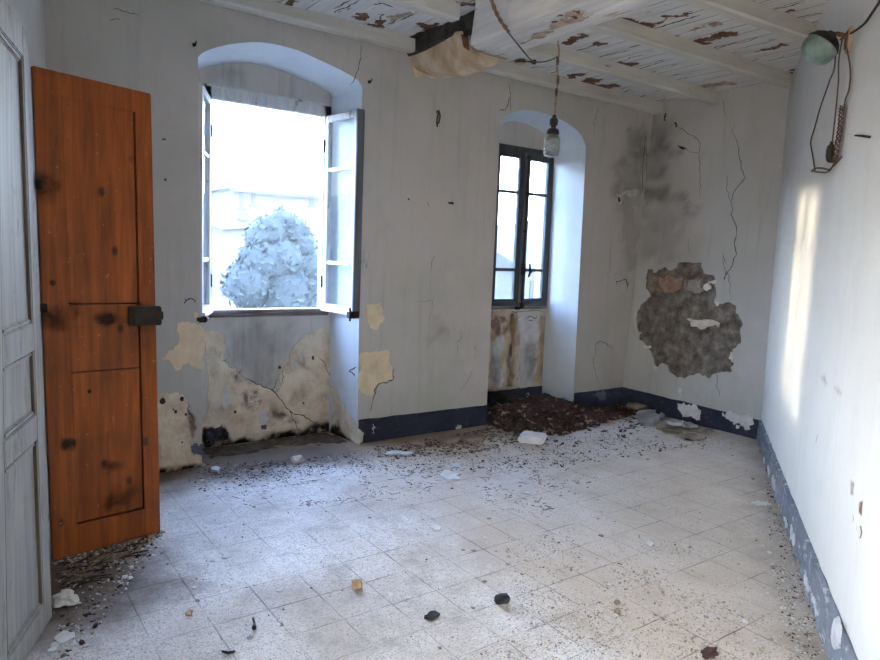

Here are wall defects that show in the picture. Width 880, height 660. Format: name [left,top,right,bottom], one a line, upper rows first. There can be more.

peeling [334,0,441,33]
peeling [520,9,687,80]
peeling [622,11,761,49]
peeling [753,39,801,61]
peeling [562,73,645,97]
crack [723,101,746,299]
spalling [634,262,743,378]
flaking render [157,311,376,474]
crack [245,377,314,428]
flaking render [357,350,394,397]
peeling [678,388,701,420]
peeling [722,410,754,430]